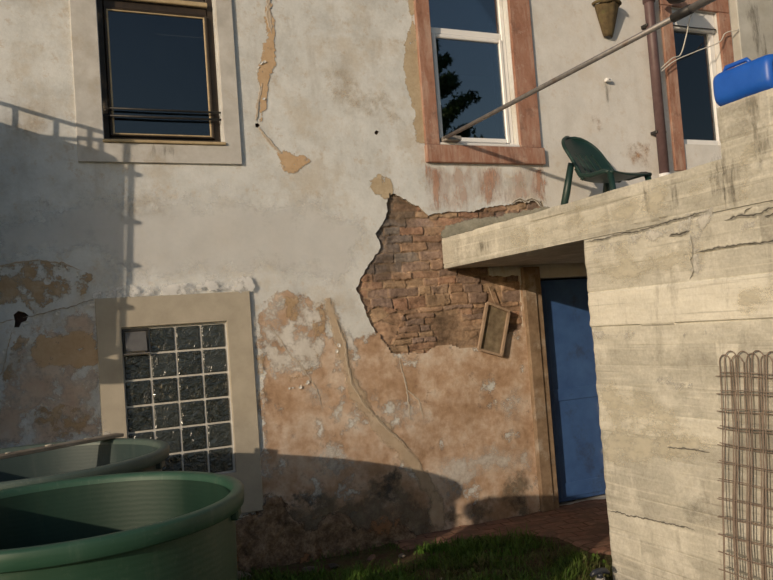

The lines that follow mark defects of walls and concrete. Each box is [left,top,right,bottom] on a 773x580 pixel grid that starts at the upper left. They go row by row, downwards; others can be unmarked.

peeling [255,0,310,173]
peeling [403,0,425,143]
crack [587,211,773,278]
crack [727,206,773,220]
peeling [0,259,93,313]
peeling [236,174,544,572]
damp [289,468,432,536]